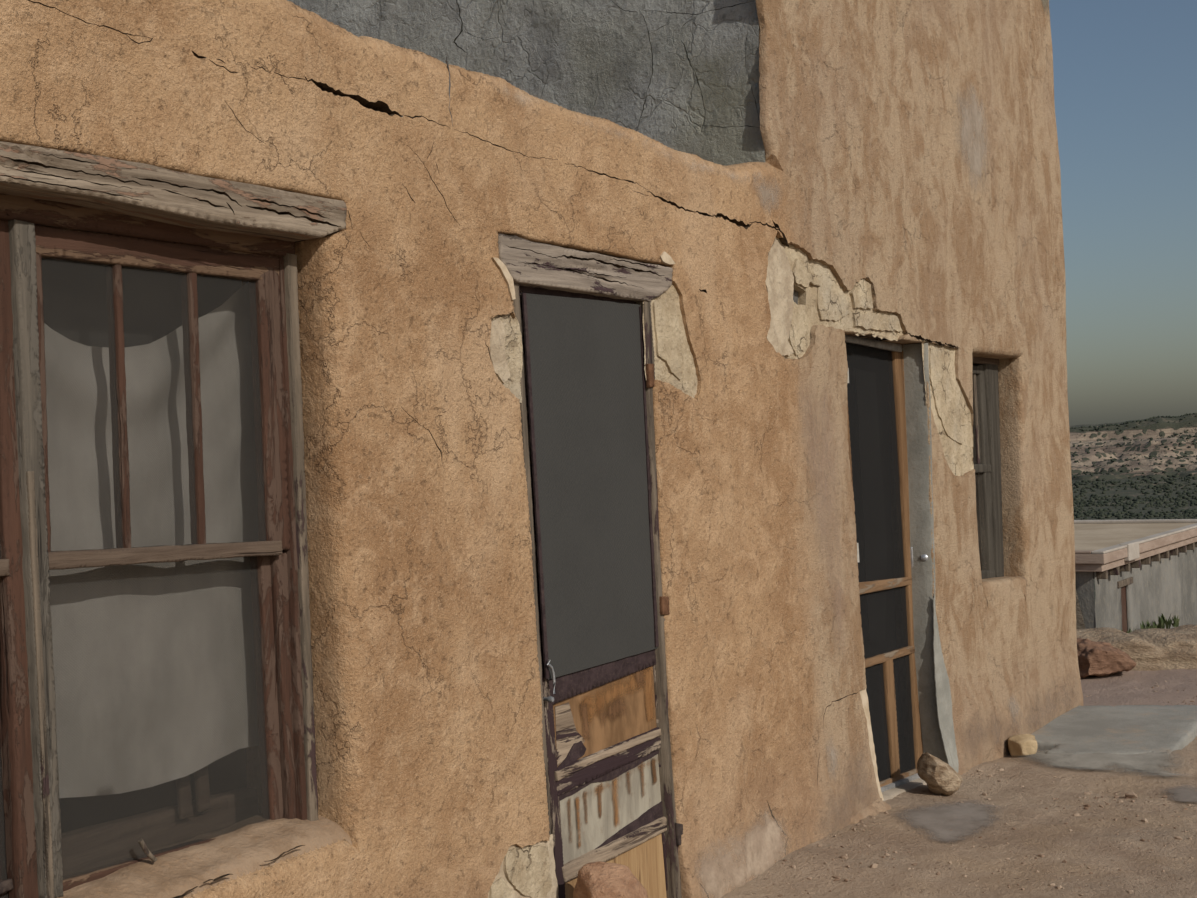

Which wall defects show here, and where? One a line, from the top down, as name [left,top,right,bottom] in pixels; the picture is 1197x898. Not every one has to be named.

crack [28,0,153,44]
crack [192,0,789,247]
peeling [490,257,523,403]
peeling [659,251,676,265]
peeling [643,284,697,398]
peeling [765,237,904,359]
peeling [922,340,974,476]
crack [173,874,233,898]
crack [264,845,306,862]
peeling [488,834,559,898]